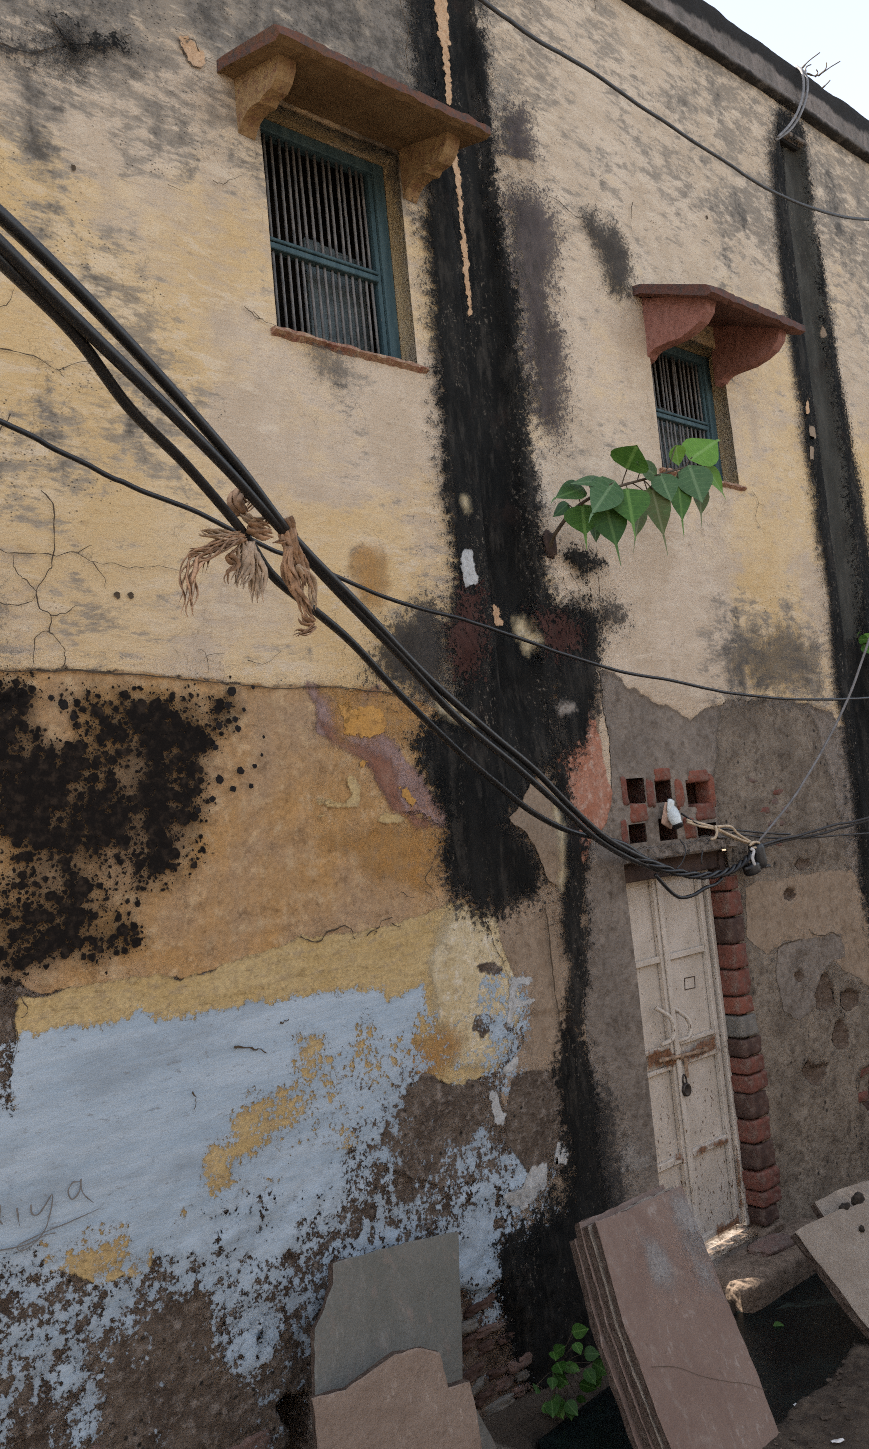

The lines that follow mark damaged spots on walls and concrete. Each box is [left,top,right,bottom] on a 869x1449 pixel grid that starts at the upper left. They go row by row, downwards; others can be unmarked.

crack [0,348,112,378]
water stain [0,574,265,993]
peeling [0,665,869,1449]
water stain [343,0,653,1390]
water stain [711,99,869,937]